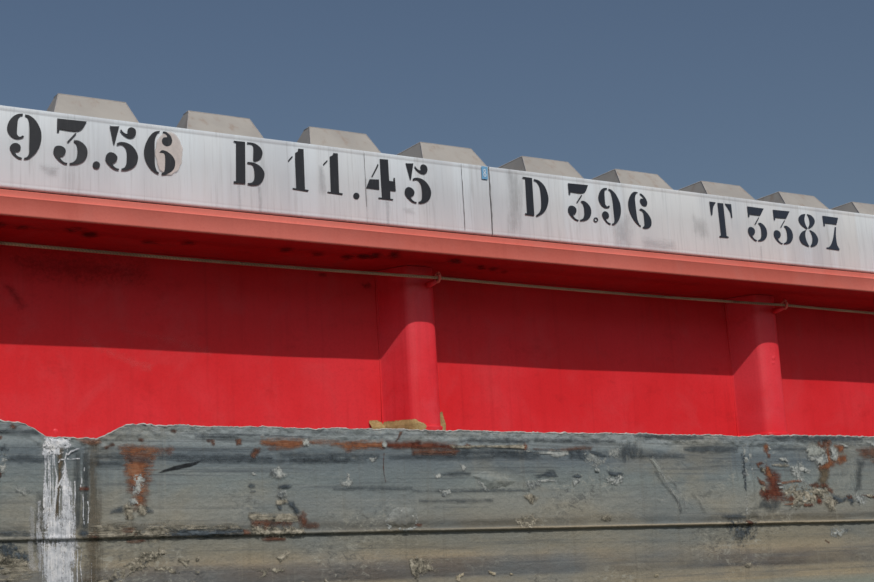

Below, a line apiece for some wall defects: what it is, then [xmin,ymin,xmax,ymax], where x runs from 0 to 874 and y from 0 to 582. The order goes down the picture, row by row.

spalling [0,531,30,582]
damp [0,431,127,582]
rust [105,438,169,506]
peeling [88,467,318,582]
rust [251,432,527,458]
peeling [369,419,427,430]
rust [757,441,848,508]